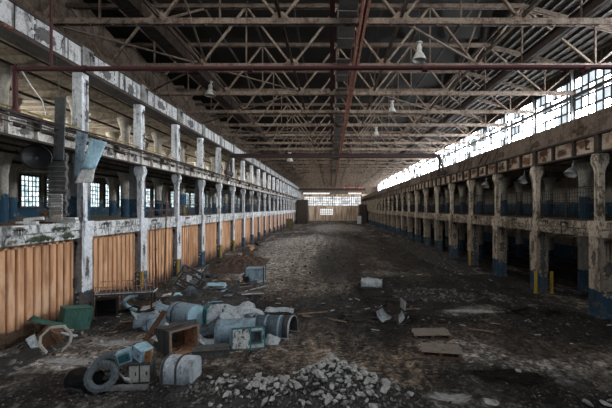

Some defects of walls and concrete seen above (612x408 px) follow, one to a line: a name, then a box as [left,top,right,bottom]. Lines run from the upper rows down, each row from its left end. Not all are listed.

peeling [27,19,60,49]
damp [14,227,78,262]